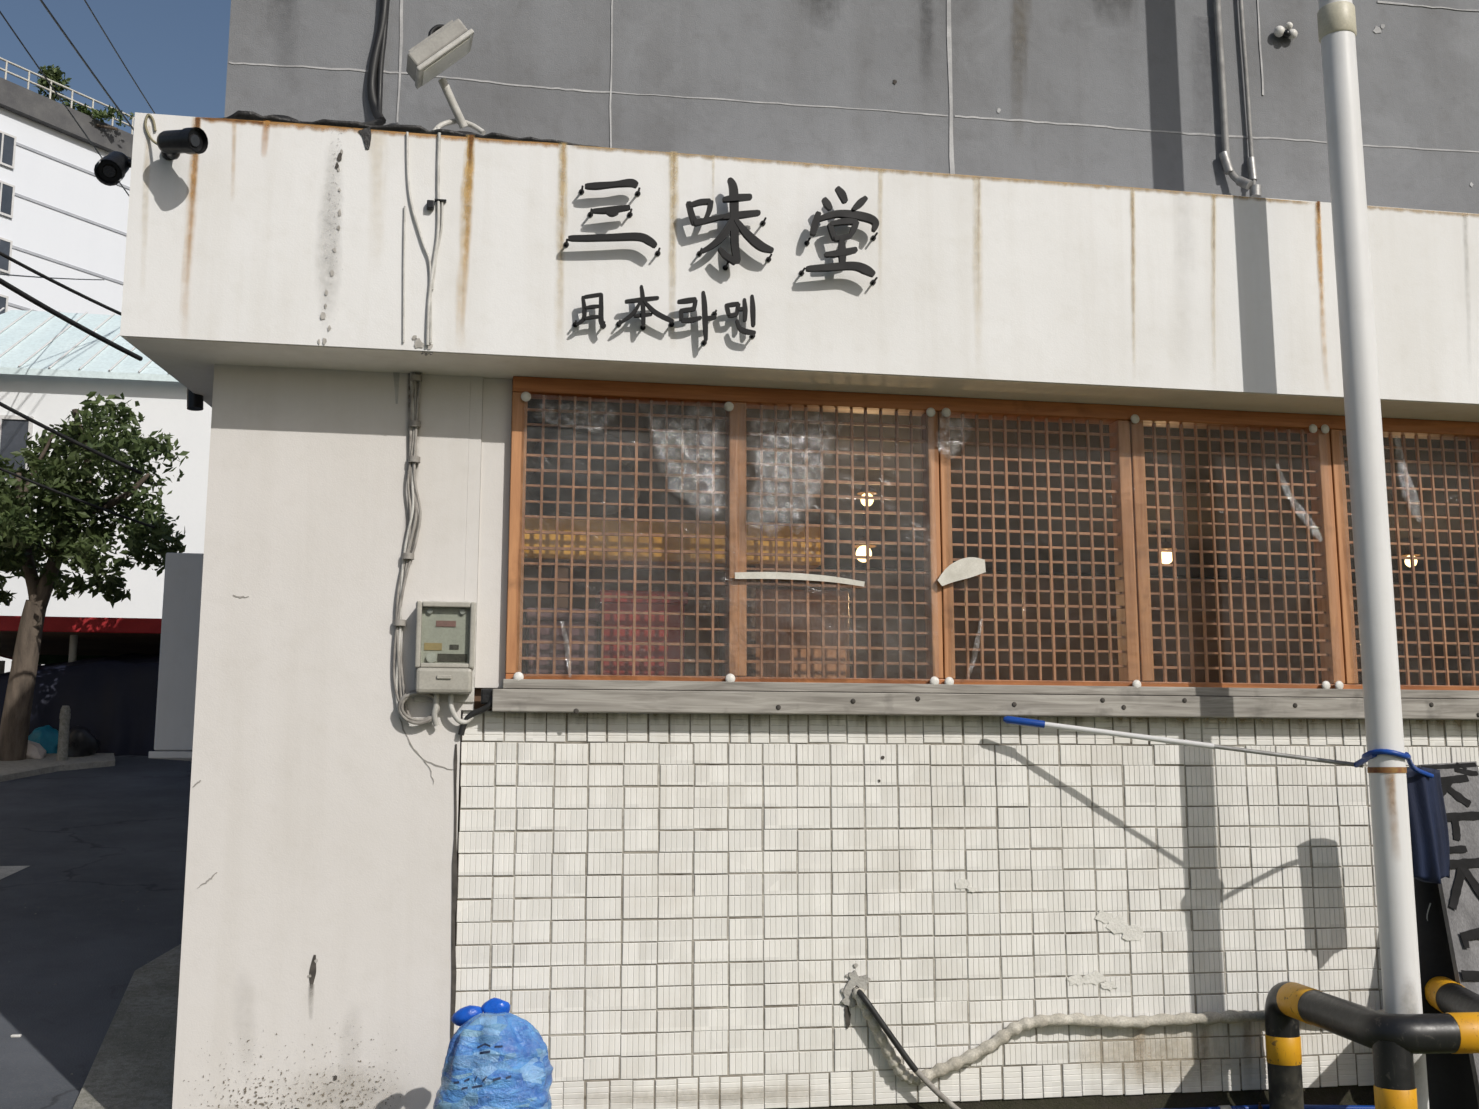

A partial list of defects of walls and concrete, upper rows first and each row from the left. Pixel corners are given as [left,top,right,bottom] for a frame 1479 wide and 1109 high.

corrosion [196,117,1322,298]
damp [184,1031,398,1109]